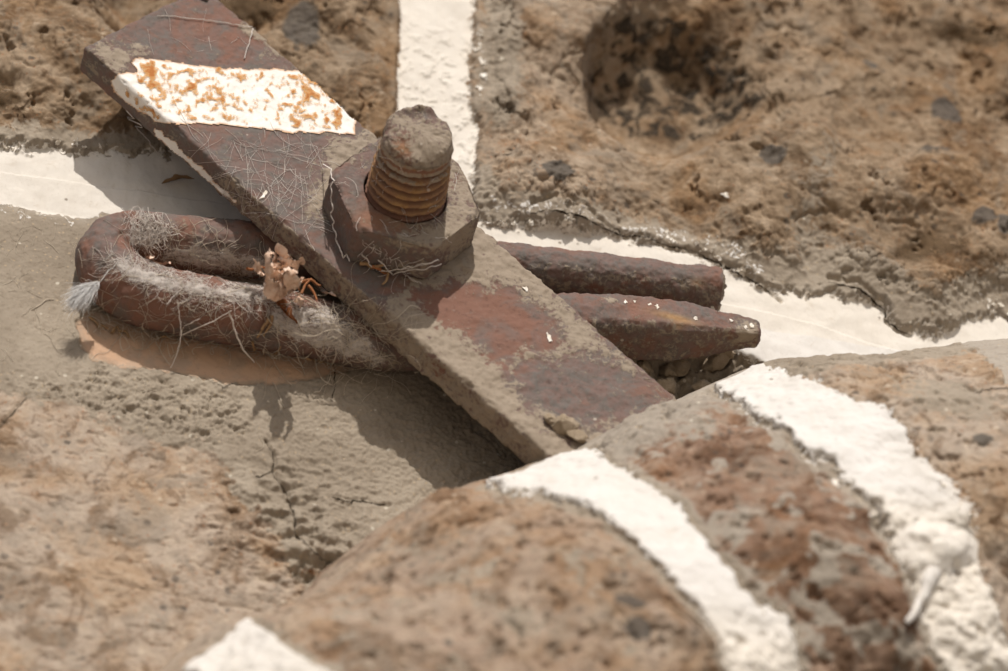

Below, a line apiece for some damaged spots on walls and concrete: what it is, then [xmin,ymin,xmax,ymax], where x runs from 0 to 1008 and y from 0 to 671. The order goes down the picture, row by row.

rust [125,60,343,129]
crack [254,445,332,563]